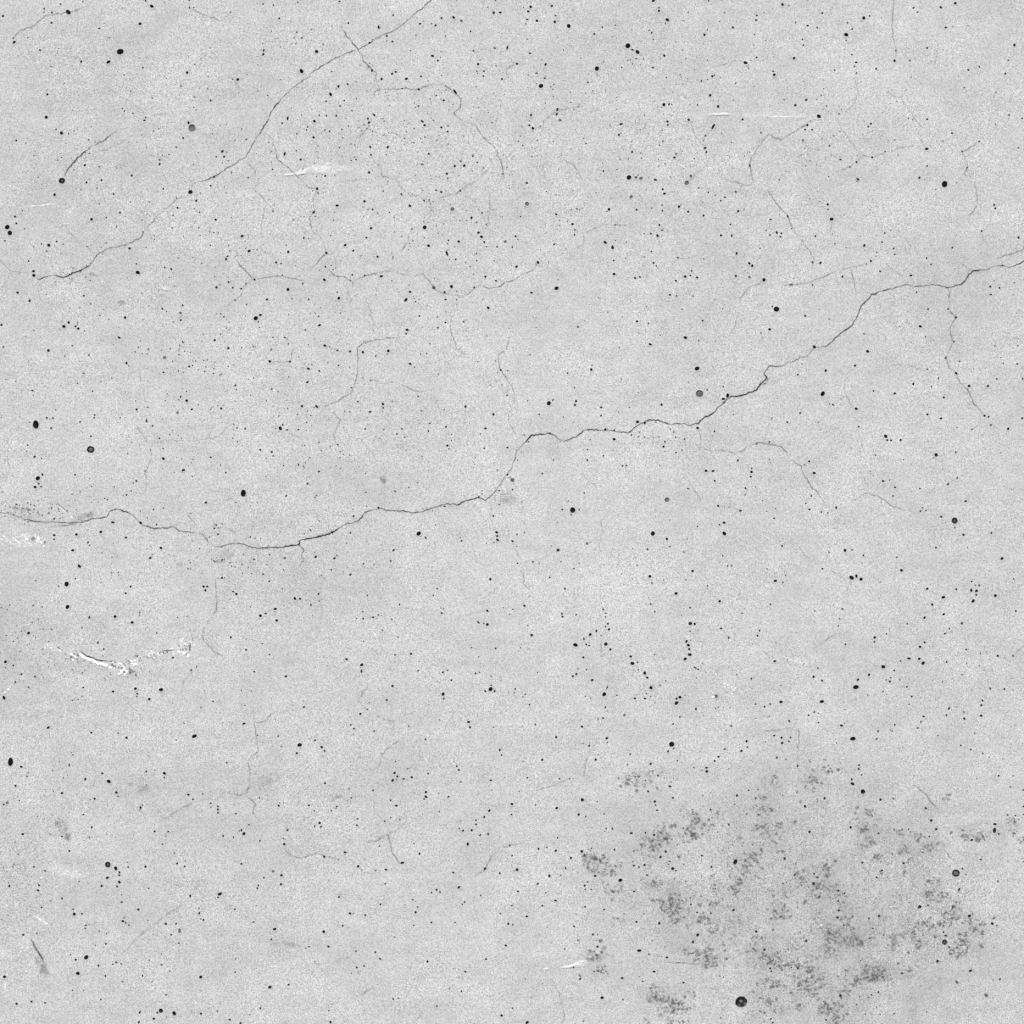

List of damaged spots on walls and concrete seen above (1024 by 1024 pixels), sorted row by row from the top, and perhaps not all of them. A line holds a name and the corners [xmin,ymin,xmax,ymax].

crack [37,0,431,280]
crack [0,251,1024,561]
mould [754,949,885,1024]
mould [887,880,995,971]